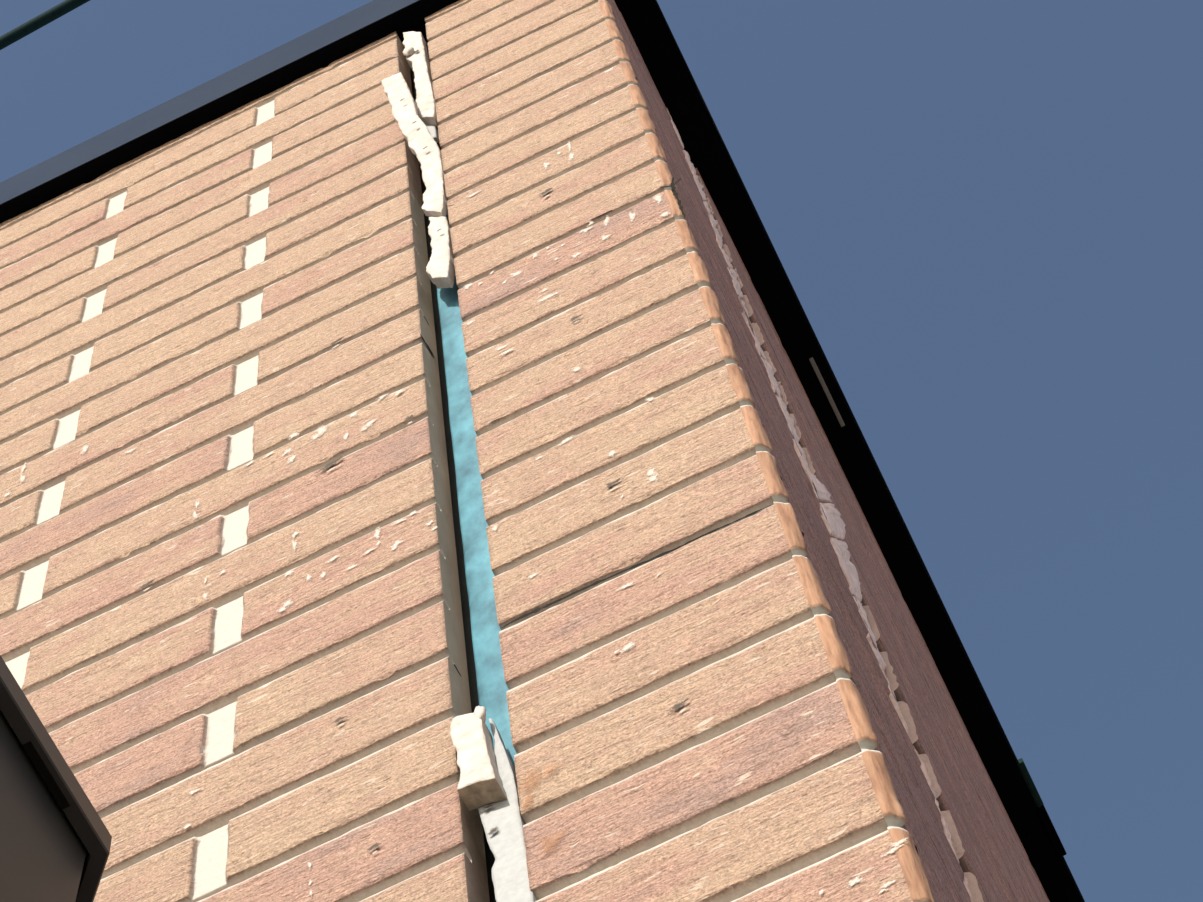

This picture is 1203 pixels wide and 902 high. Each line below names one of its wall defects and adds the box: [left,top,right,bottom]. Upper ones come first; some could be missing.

crack [502,500,782,628]
peeling [666,109,959,862]